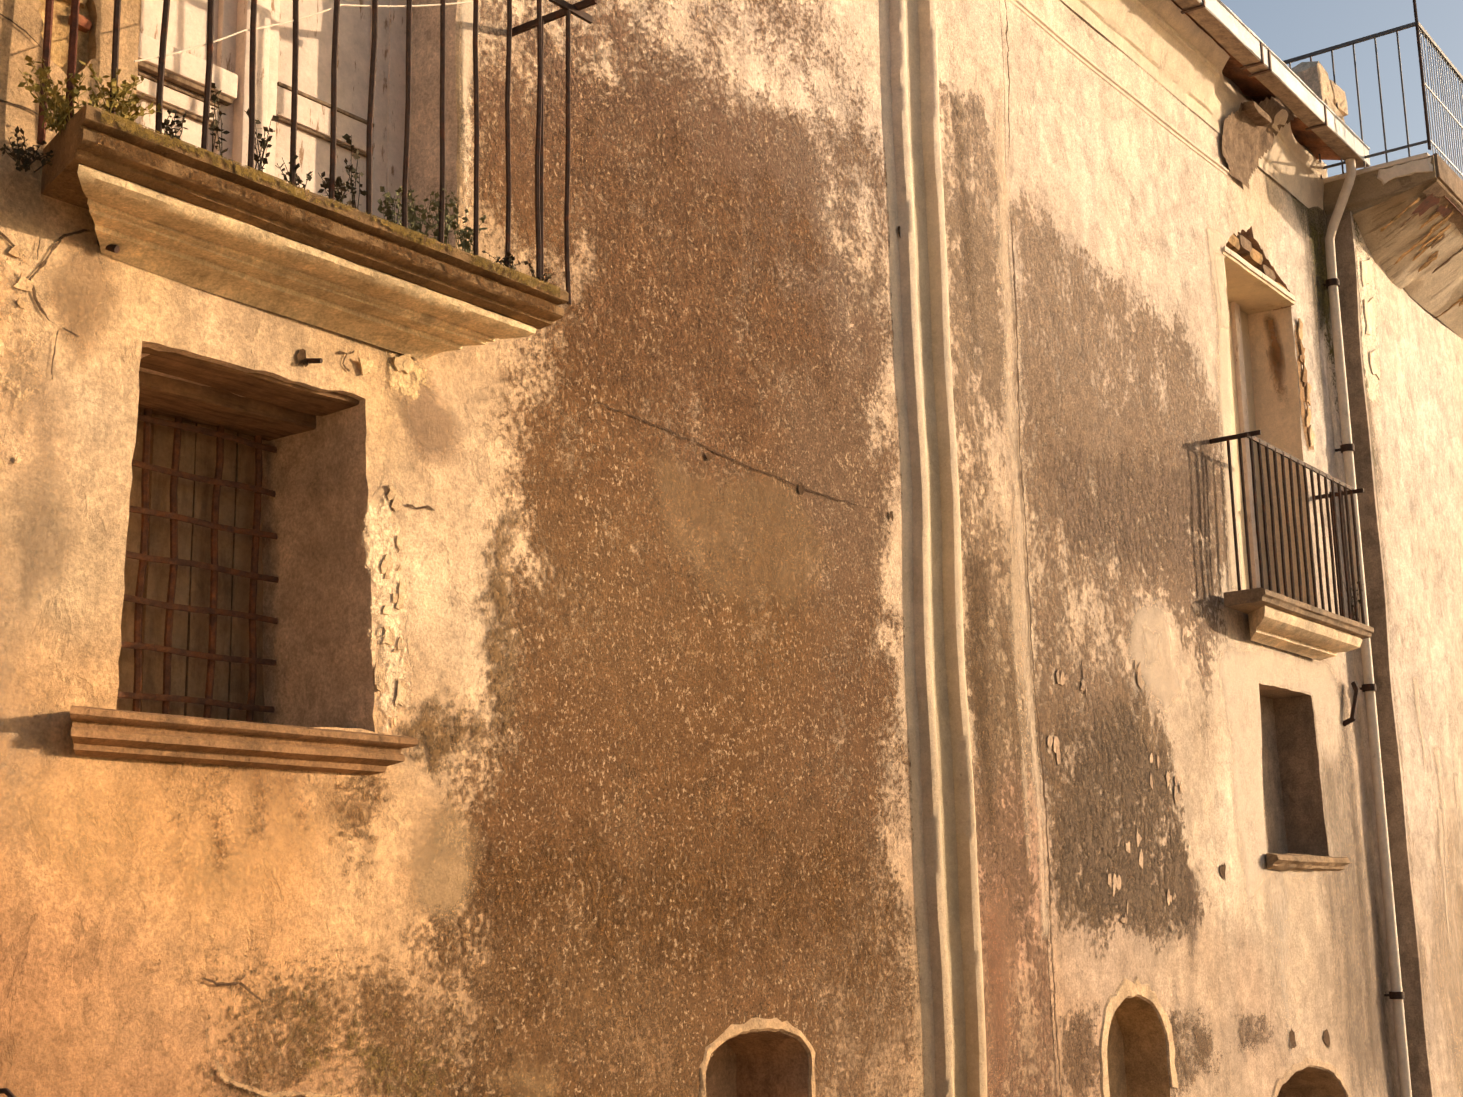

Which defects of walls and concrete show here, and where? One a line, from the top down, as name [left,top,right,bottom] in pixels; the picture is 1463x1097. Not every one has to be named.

crack [0,13,39,45]
crack [0,99,38,115]
leakage [96,132,343,231]
spalling [1377,157,1463,273]
flaking render [0,239,51,435]
crack [0,229,87,380]
flaking render [1356,244,1382,410]
leakage [191,0,925,1097]
leakage [939,79,1229,1097]
leakage [160,761,287,885]